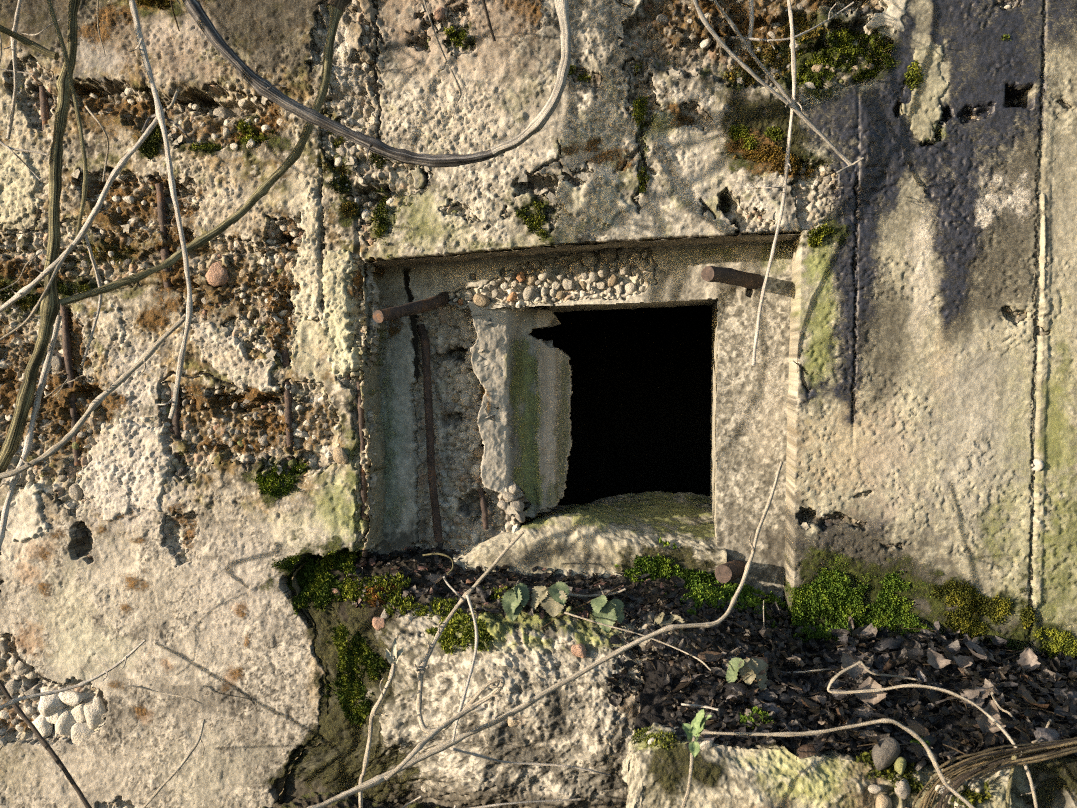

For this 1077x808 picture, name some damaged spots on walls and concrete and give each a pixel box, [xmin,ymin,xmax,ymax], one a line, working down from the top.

rust [0,235,80,297]
rust [23,304,131,466]
rust [70,172,337,468]
spalling [0,0,433,564]
rust [373,292,450,542]
spalling [412,304,525,552]
rust [701,266,764,289]
spalling [615,0,908,192]
crack [851,174,859,421]
leakage [672,0,1077,424]
crack [1028,0,1045,635]
spalling [0,633,109,747]